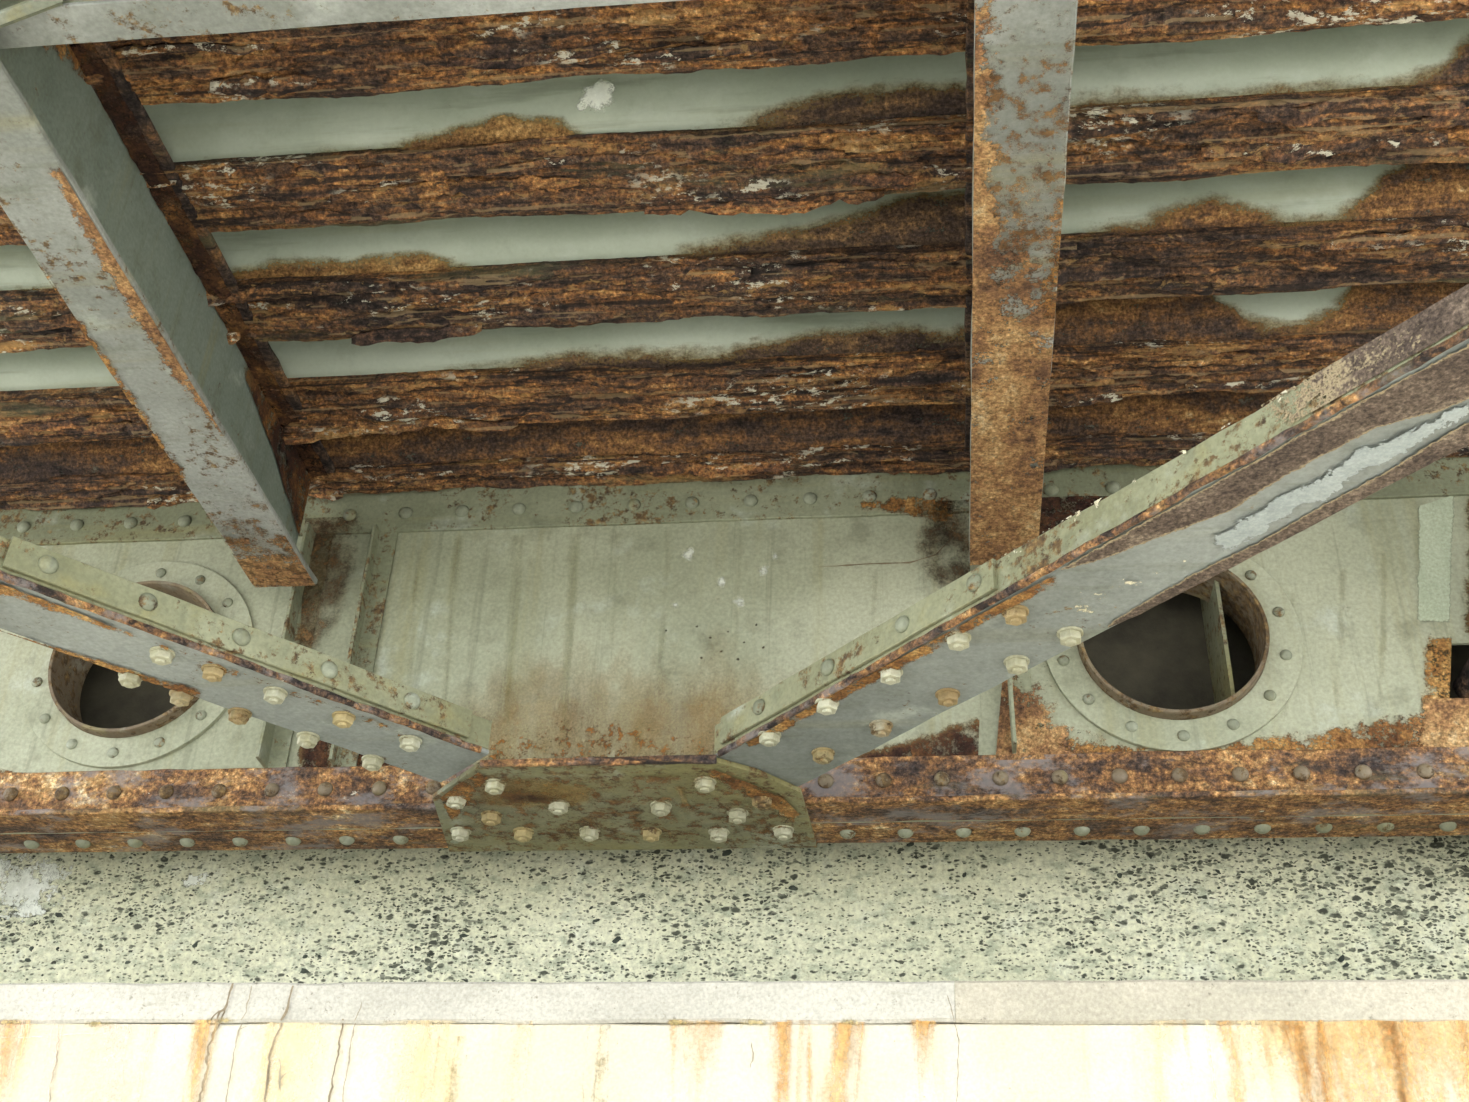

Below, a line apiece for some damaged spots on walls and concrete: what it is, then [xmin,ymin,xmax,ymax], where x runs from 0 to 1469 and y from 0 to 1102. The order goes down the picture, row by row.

corrosion [0,0,1469,648]
peeling [1062,344,1469,570]
peeling [1107,423,1469,628]
corrosion [1,631,201,698]
corrosion [297,740,331,767]
corrosion [441,696,799,841]
corrosion [746,577,1056,747]
corrosion [856,666,1146,760]
crack [198,983,294,1102]
crack [328,1002,362,1102]
corrosion [776,1022,789,1101]
corrosion [1206,1020,1469,1102]